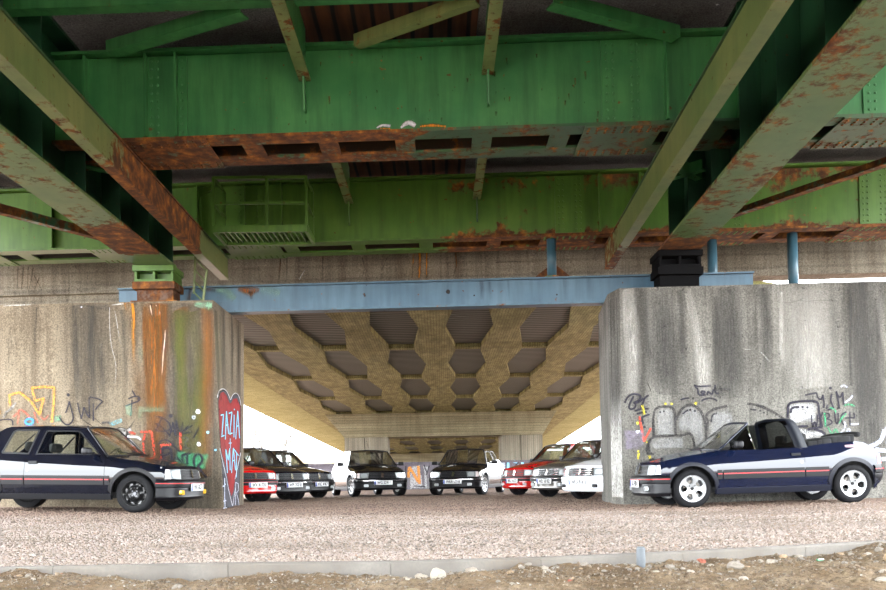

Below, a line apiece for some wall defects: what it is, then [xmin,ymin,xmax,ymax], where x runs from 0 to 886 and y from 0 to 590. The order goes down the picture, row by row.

corrosion [131,303,166,441]
water stain [162,326,215,486]
water stain [850,282,882,459]